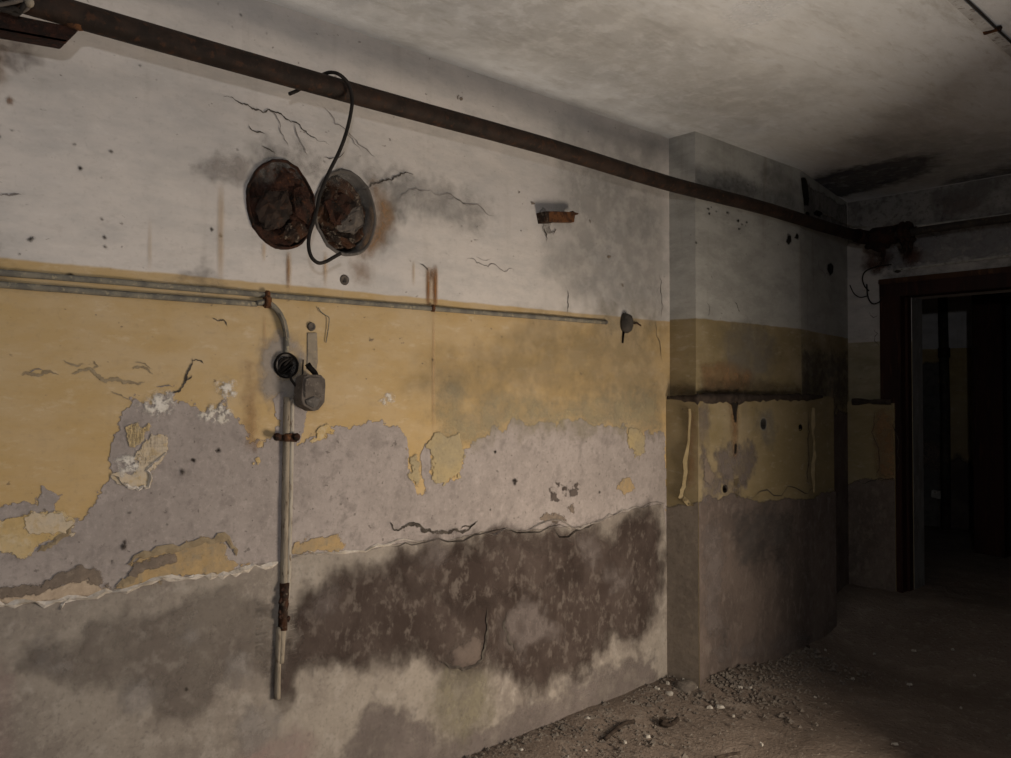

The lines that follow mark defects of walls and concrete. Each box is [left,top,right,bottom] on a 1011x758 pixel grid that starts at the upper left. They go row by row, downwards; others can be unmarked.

crack [224,96,373,159]
crack [364,172,491,216]
rust [421,264,437,305]
crack [22,359,204,400]
damp [116,456,139,477]
crack [391,522,476,534]
peeling [699,411,896,687]
peeling [0,391,667,758]
damp [29,502,699,758]